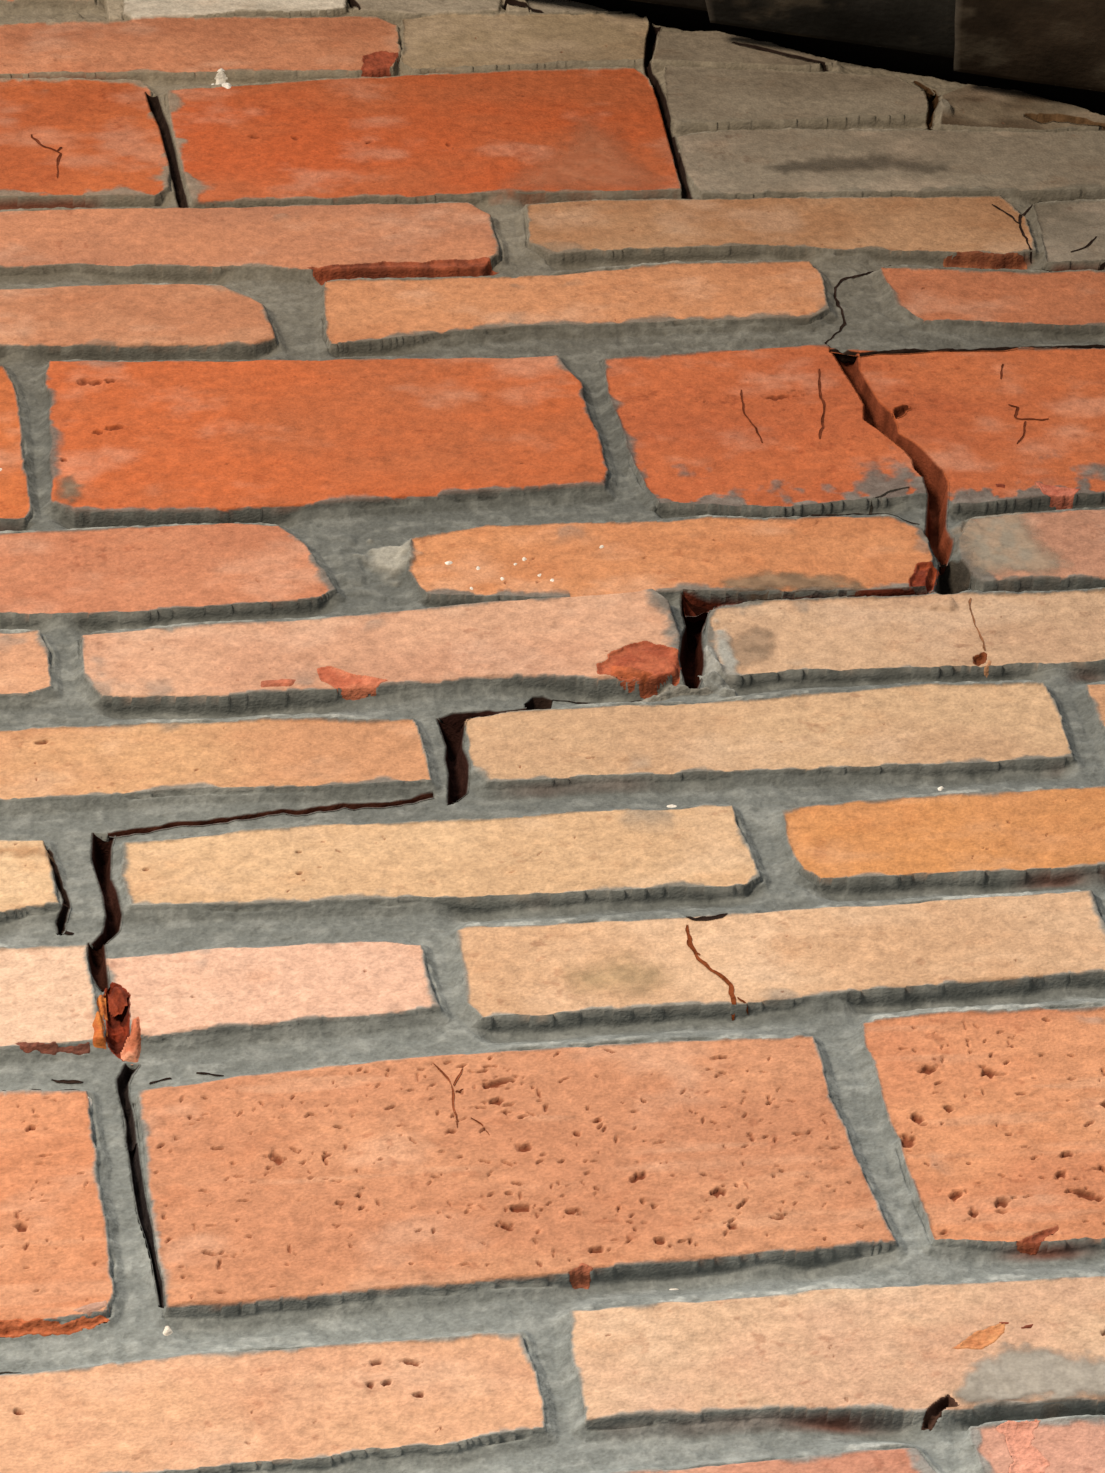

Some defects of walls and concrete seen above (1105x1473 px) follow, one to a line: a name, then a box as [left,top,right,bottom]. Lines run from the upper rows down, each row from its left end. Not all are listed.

crack [31,134,62,178]
crack [144,92,189,208]
crack [643,21,694,199]
crack [678,265,1105,689]
spalling [596,641,738,702]
crack [44,695,591,992]
crack [685,913,748,1021]
spalling [15,982,142,1065]
crack [433,1063,489,1134]
crack [2,1063,224,1308]
spalling [921,1394,960,1430]